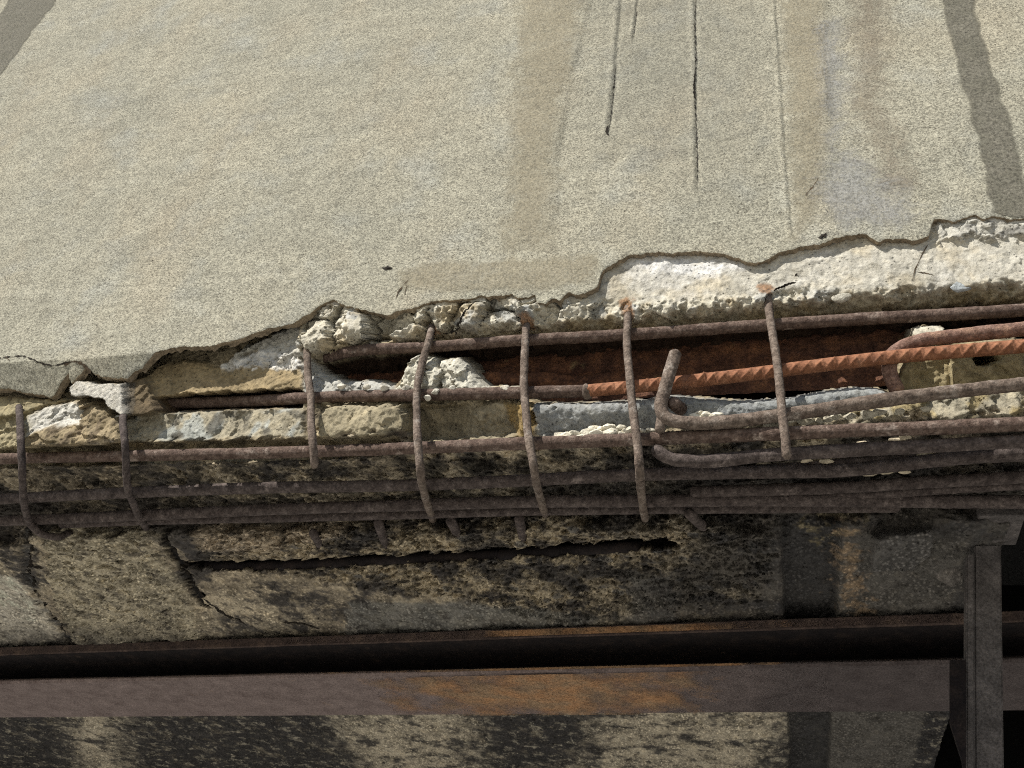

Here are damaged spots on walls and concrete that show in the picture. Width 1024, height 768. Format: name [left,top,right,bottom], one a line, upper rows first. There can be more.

crack [605,67,616,135]
crack [691,0,699,185]
damp [943,0,1024,217]
corrosion [620,298,634,318]
spalling [0,215,1024,627]
crack [160,525,245,625]
corrosion [491,624,728,637]
corrosion [394,663,742,716]